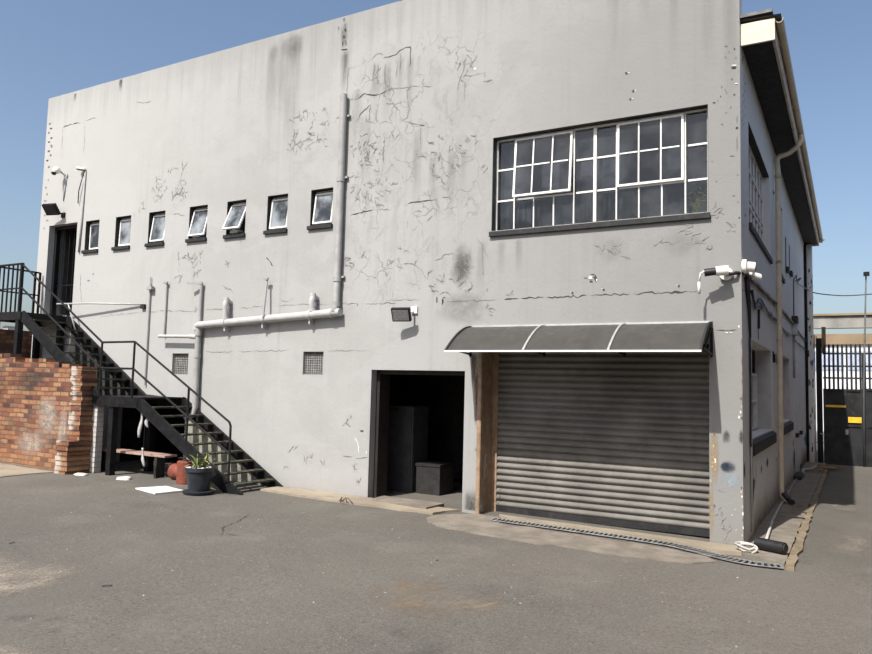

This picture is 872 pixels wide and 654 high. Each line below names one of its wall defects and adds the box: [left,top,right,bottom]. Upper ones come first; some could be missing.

crack [346,47,433,163]
crack [354,200,440,220]
crack [444,291,696,302]